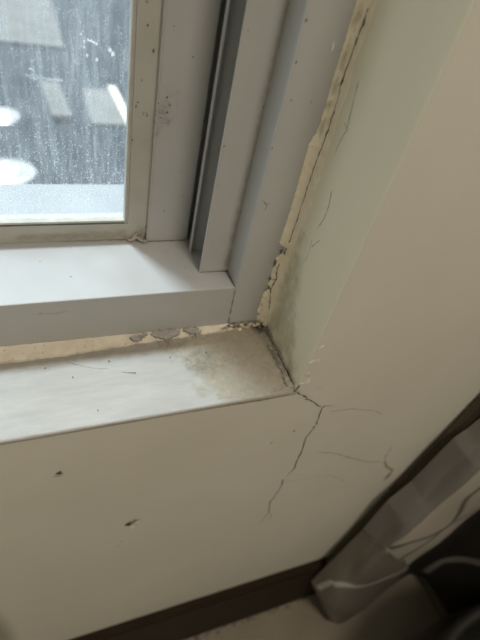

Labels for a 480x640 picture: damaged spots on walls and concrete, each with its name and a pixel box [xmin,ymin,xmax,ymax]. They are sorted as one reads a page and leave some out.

crack [265,8,369,309]
damp [168,327,297,402]
crack [236,326,333,522]